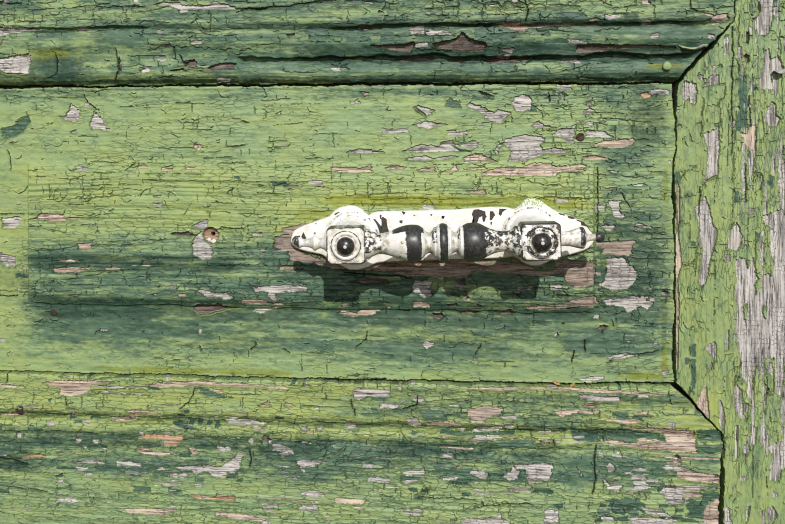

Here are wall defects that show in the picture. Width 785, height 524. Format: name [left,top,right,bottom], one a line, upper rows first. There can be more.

crack [248,0,332,10]
crack [731,28,751,138]
peeling [386,106,635,180]
peeling [373,215,389,233]
peeling [472,208,506,225]
crack [344,271,409,279]
peeling [361,240,653,320]
peeling [191,285,307,317]
peeling [706,209,785,459]
crack [321,376,386,384]
peeling [461,376,732,524]
crack [422,496,530,506]